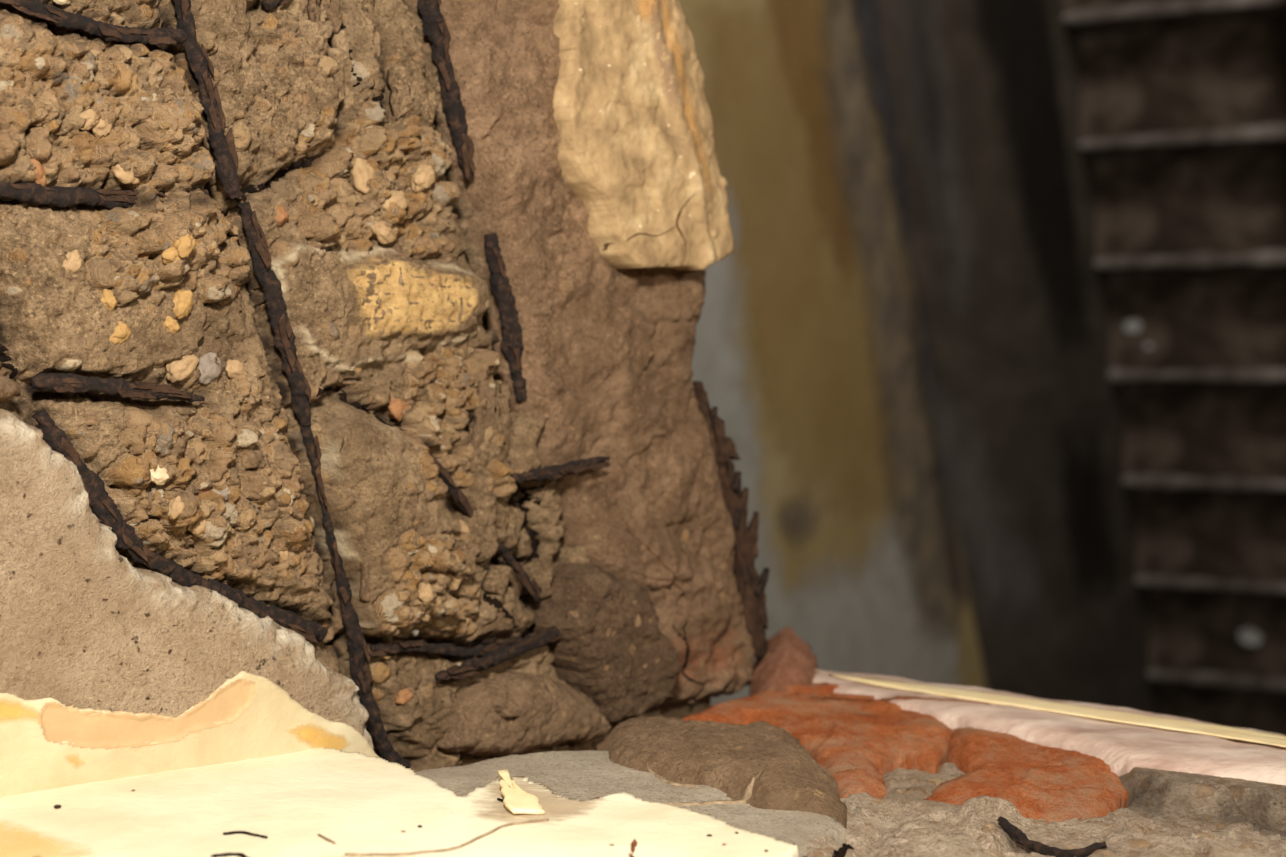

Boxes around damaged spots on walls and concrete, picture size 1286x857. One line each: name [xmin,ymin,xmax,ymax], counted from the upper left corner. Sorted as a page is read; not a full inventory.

rust [0,0,66,24]
rust [99,27,178,45]
rust [201,44,238,168]
rust [462,133,475,175]
leakage [980,0,1083,341]
rust [61,437,90,497]
rust [118,381,192,399]
spalling [0,0,589,680]
spalling [365,0,1286,857]
leakage [714,0,1038,634]
rust [288,624,318,643]
peeling [0,671,383,797]